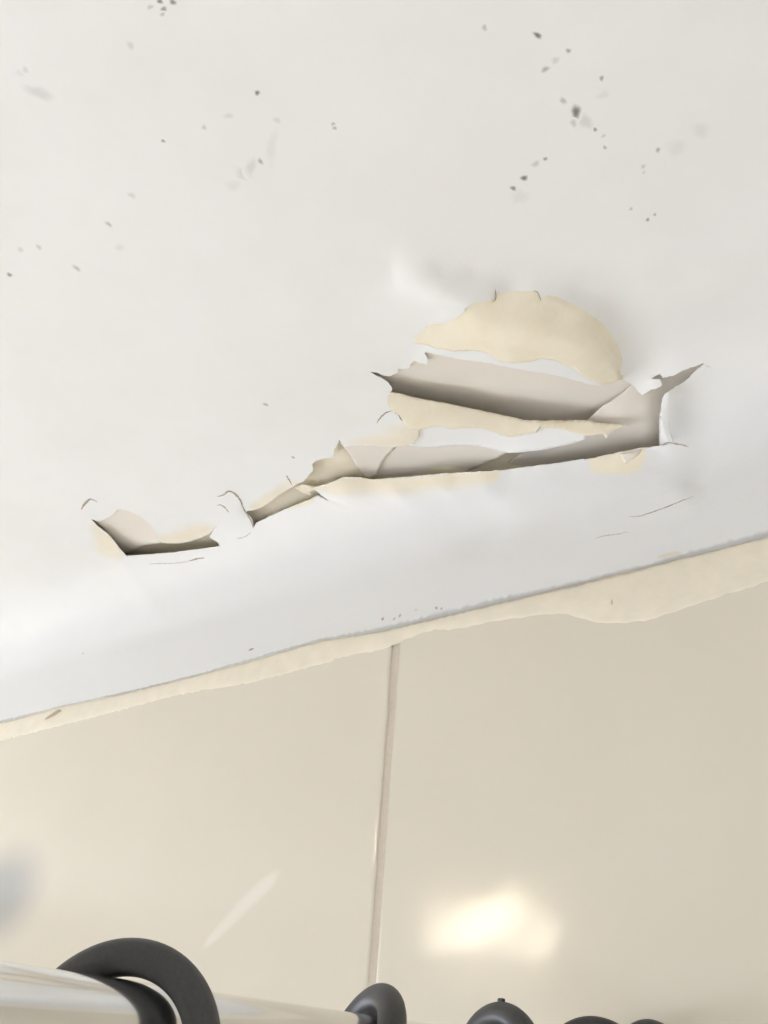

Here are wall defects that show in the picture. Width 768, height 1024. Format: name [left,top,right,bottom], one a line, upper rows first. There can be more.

damp [145,0,179,18]
damp [530,30,544,41]
damp [557,73,613,151]
damp [507,156,549,208]
peeling [76,290,724,572]